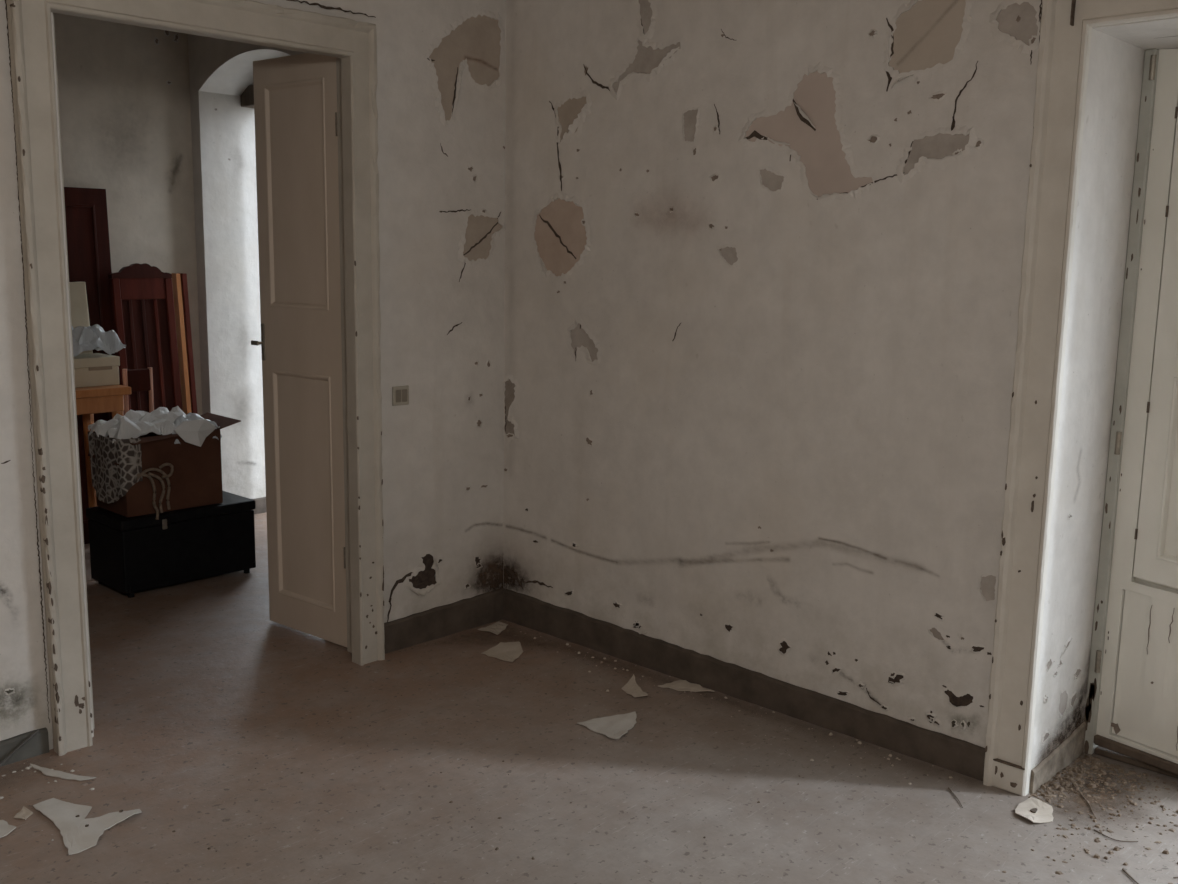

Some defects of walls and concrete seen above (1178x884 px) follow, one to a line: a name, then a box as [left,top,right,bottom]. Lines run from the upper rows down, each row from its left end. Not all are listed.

peeling [425,8,506,126]
peeling [868,0,974,91]
peeling [989,0,1042,65]
peeling [530,0,685,293]
peeling [682,107,700,157]
peeling [738,61,984,206]
peeling [439,208,505,282]
flaking render [359,545,443,634]
mould [464,555,553,592]
mould [1043,689,1087,757]